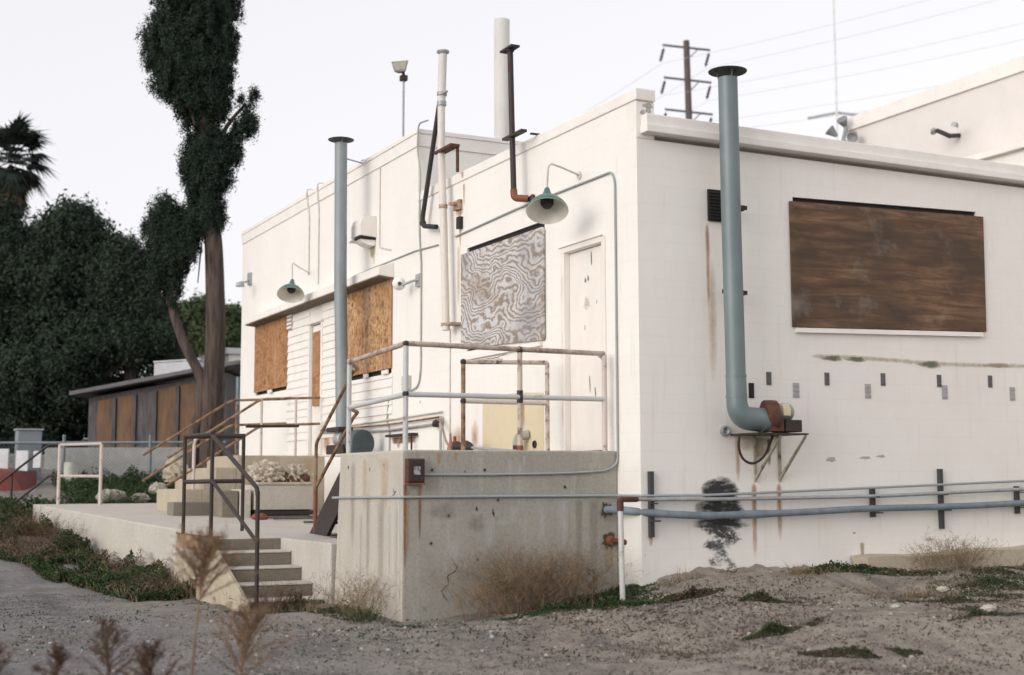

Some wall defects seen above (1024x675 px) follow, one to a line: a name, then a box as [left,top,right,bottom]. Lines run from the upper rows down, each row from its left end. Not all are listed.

rust [404,485,421,554]